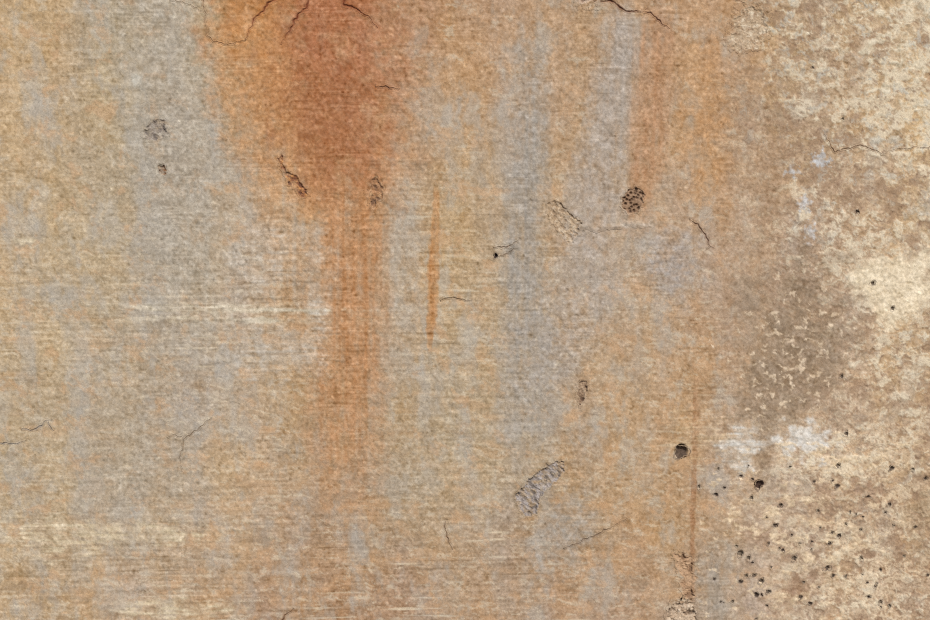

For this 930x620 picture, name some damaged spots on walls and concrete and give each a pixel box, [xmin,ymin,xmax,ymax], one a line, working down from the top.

crack [170,0,311,46]
crack [341,0,378,28]
rust [179,0,471,542]
spalling [514,459,567,519]